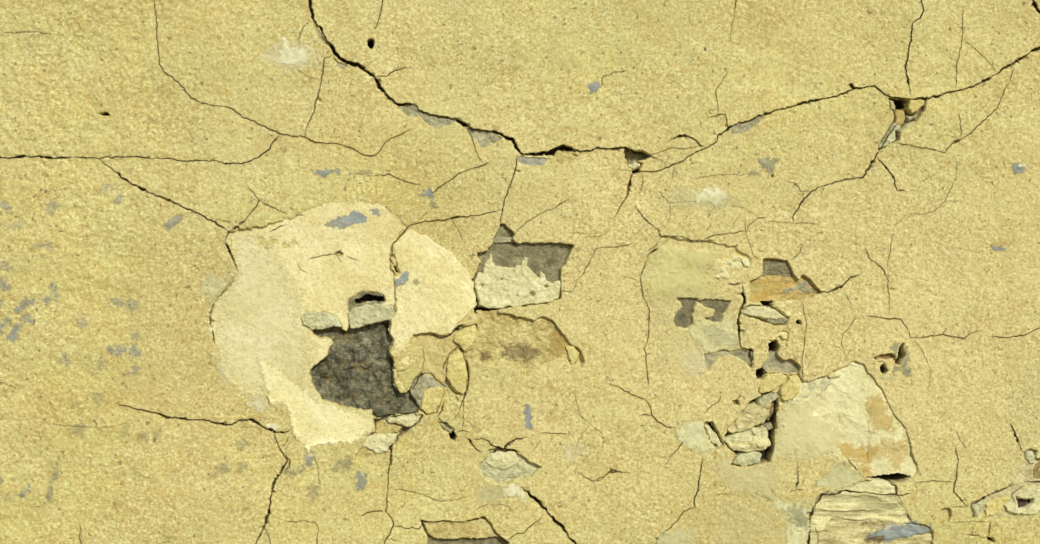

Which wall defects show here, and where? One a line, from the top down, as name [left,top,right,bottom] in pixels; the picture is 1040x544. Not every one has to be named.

crack [0,0,1040,428]
flaking render [204,200,580,466]
crack [401,325,566,453]
flaking render [673,298,730,328]
flaking render [710,255,819,322]
flaking render [704,331,917,478]
crack [118,390,319,544]
crack [362,450,463,544]
flaking render [422,516,508,544]
crack [509,488,576,544]
crack [728,432,1040,544]
flaking render [968,449,1040,518]